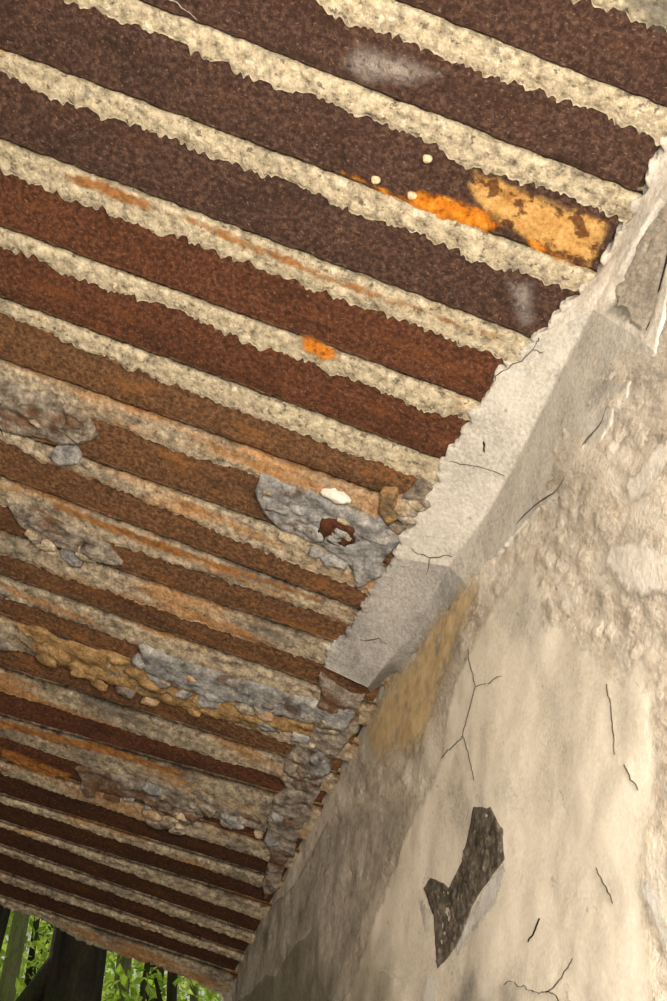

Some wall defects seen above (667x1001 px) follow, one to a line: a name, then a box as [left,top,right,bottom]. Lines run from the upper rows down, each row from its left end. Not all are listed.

corrosion [66,174,149,209]
corrosion [187,216,376,296]
corrosion [379,178,605,264]
spalling [0,374,99,466]
spalling [7,504,123,568]
corrosion [318,518,356,547]
spalling [255,473,434,588]
spalling [0,622,365,900]
crack [441,649,500,780]
crack [606,684,638,790]
flaking render [419,807,505,968]
crack [504,958,573,1001]